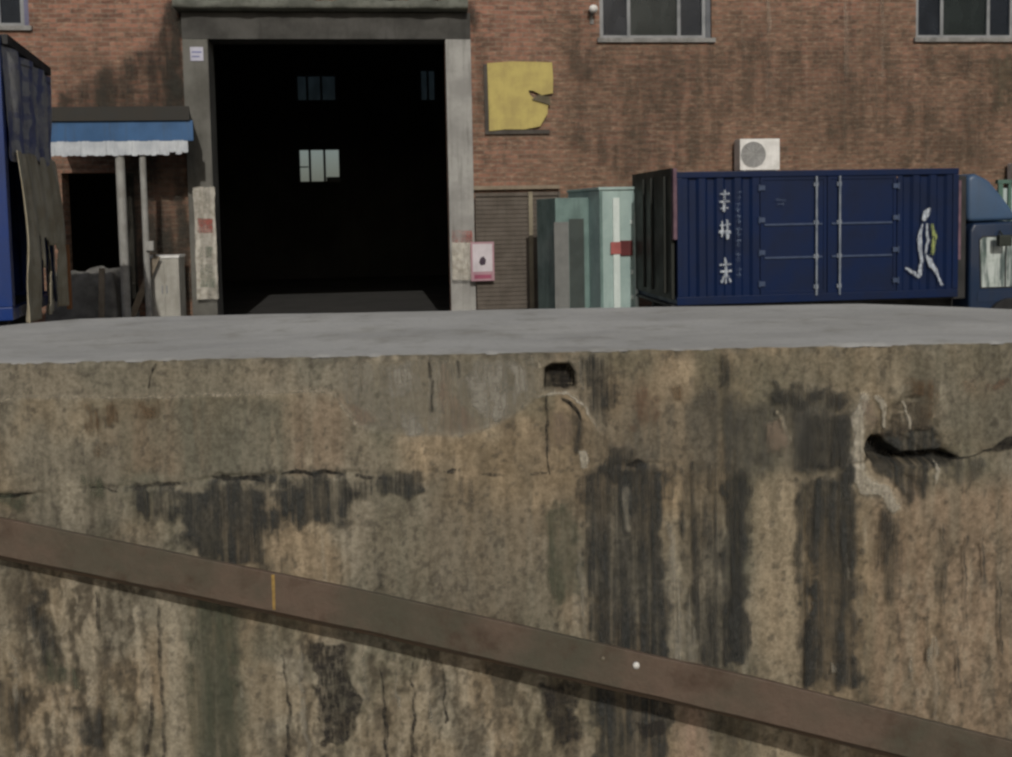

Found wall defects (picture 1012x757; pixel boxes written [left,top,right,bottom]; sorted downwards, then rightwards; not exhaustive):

leakage [582,356,617,412]
crack [0,491,33,499]
crack [91,481,181,491]
leakage [132,471,425,564]
crack [212,469,391,482]
crack [530,391,595,475]
leakage [578,397,753,667]
leakage [771,381,865,692]
spalling [847,394,978,513]
crack [982,436,1012,452]
leakage [591,688,674,757]